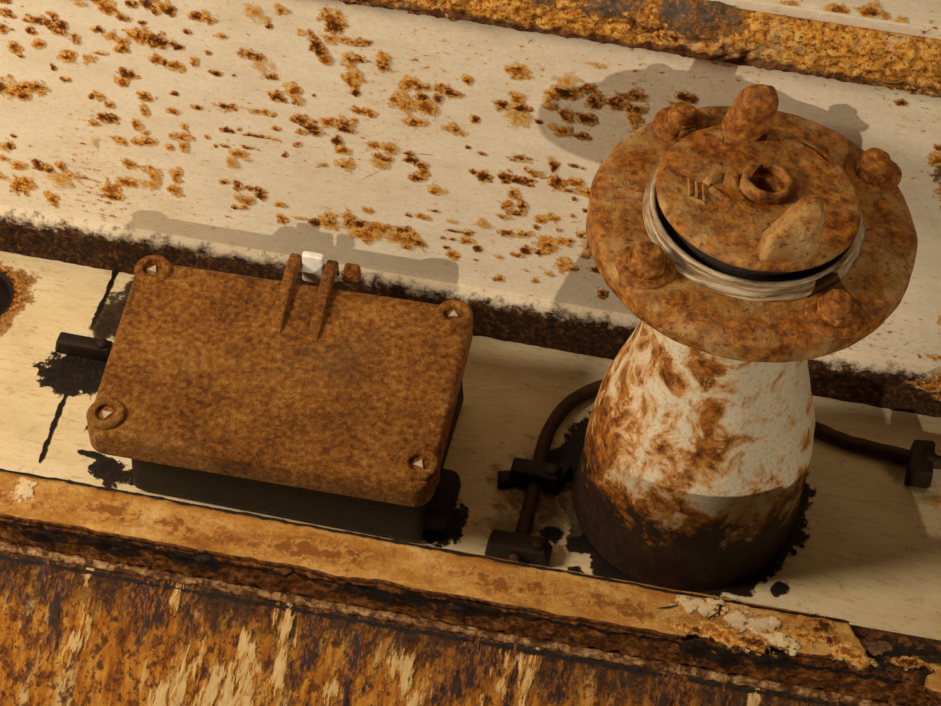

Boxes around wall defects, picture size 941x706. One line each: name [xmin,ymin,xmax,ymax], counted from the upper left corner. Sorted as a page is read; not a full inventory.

rust [0,0,235,82]
rust [815,0,908,23]
rust [0,74,51,101]
rust [86,0,447,252]
rust [387,74,487,156]
rust [0,133,89,208]
rust [440,154,600,284]
rust [0,261,39,336]
leakage [89,275,135,339]
rust [19,499,391,573]
rust [0,552,877,706]
peeling [669,591,781,636]